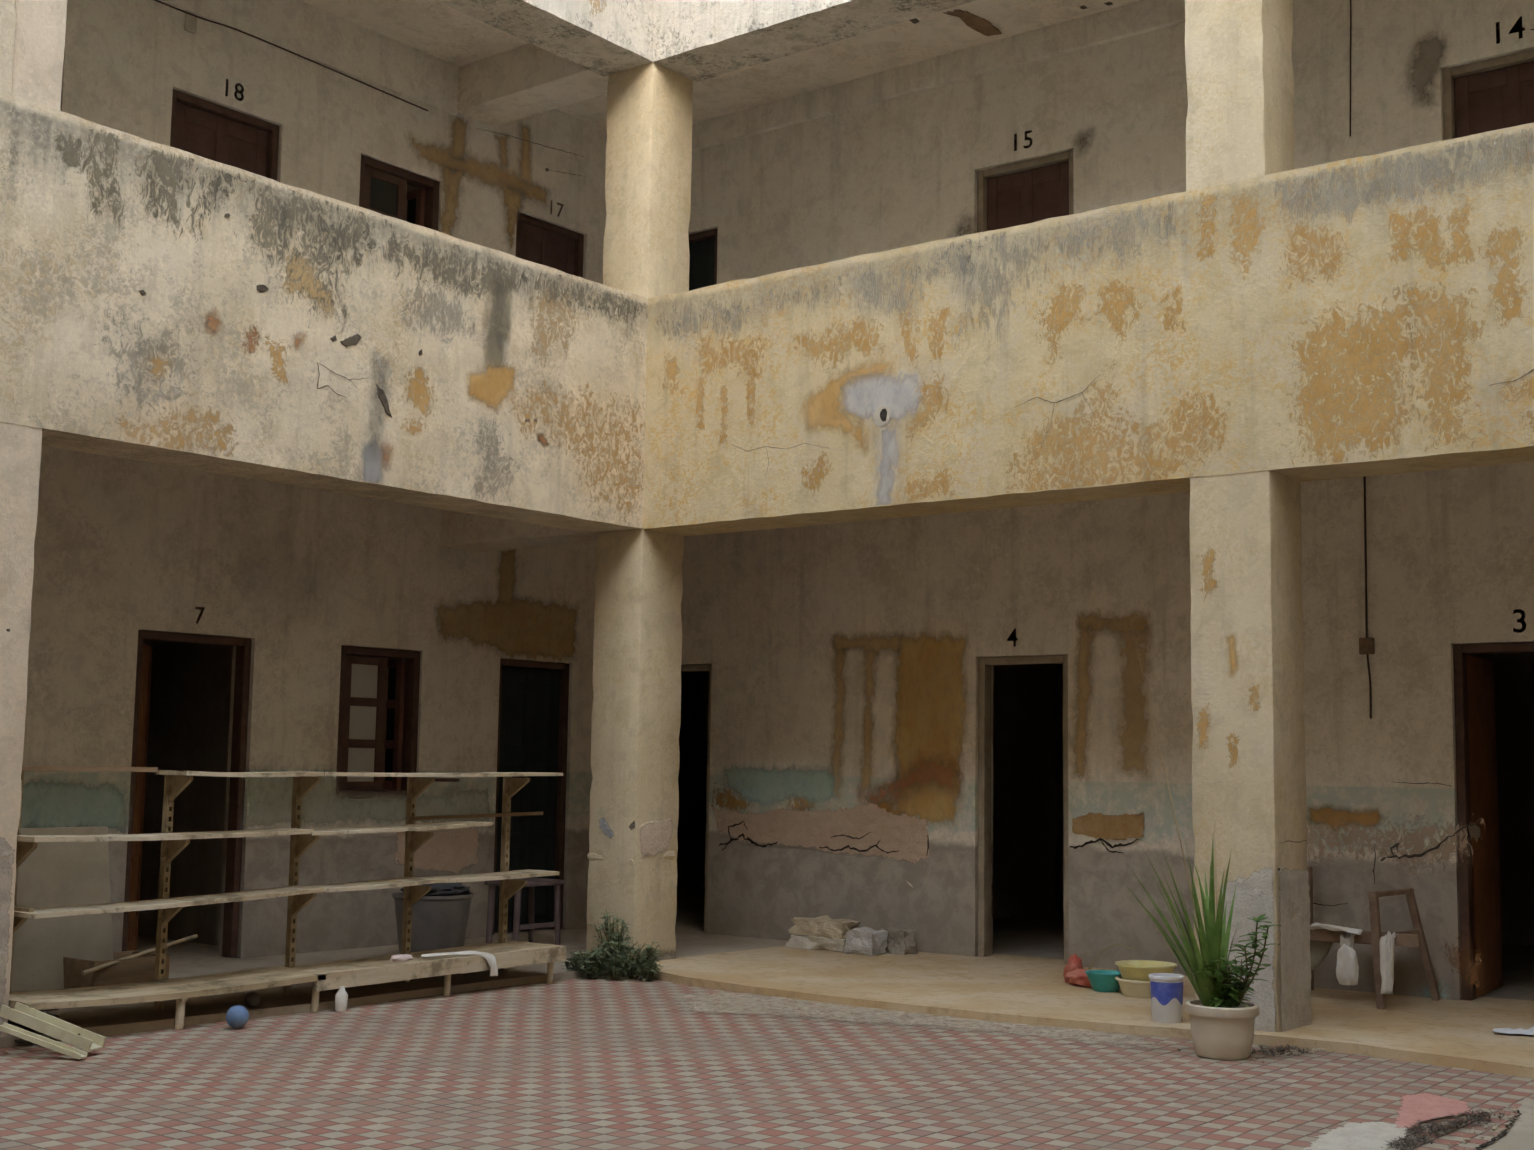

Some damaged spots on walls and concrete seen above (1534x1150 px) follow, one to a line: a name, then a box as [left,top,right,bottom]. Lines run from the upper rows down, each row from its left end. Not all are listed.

damp [55,117,645,521]
damp [658,327,770,445]
damp [793,306,963,505]
crack [1016,377,1097,447]
crack [1489,369,1534,386]
flaking render [711,784,929,864]
flaking render [1072,812,1144,841]
crack [1313,824,1475,906]